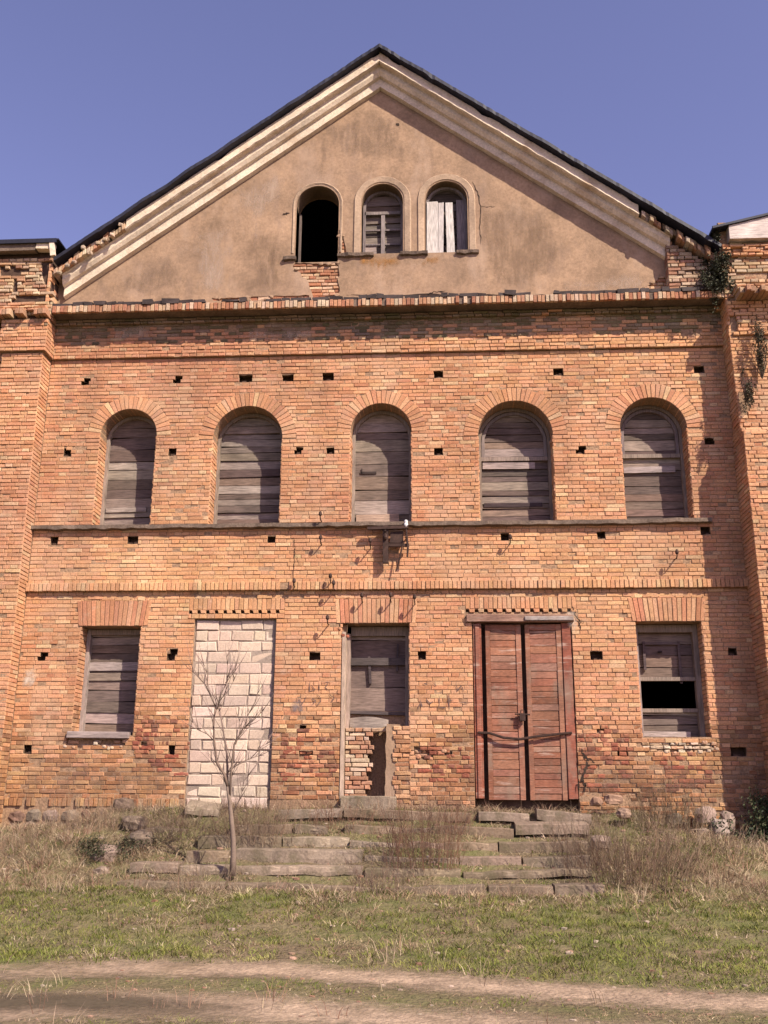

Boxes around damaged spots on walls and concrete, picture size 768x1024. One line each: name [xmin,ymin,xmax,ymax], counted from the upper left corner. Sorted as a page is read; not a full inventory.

spalling [212,231,346,301]